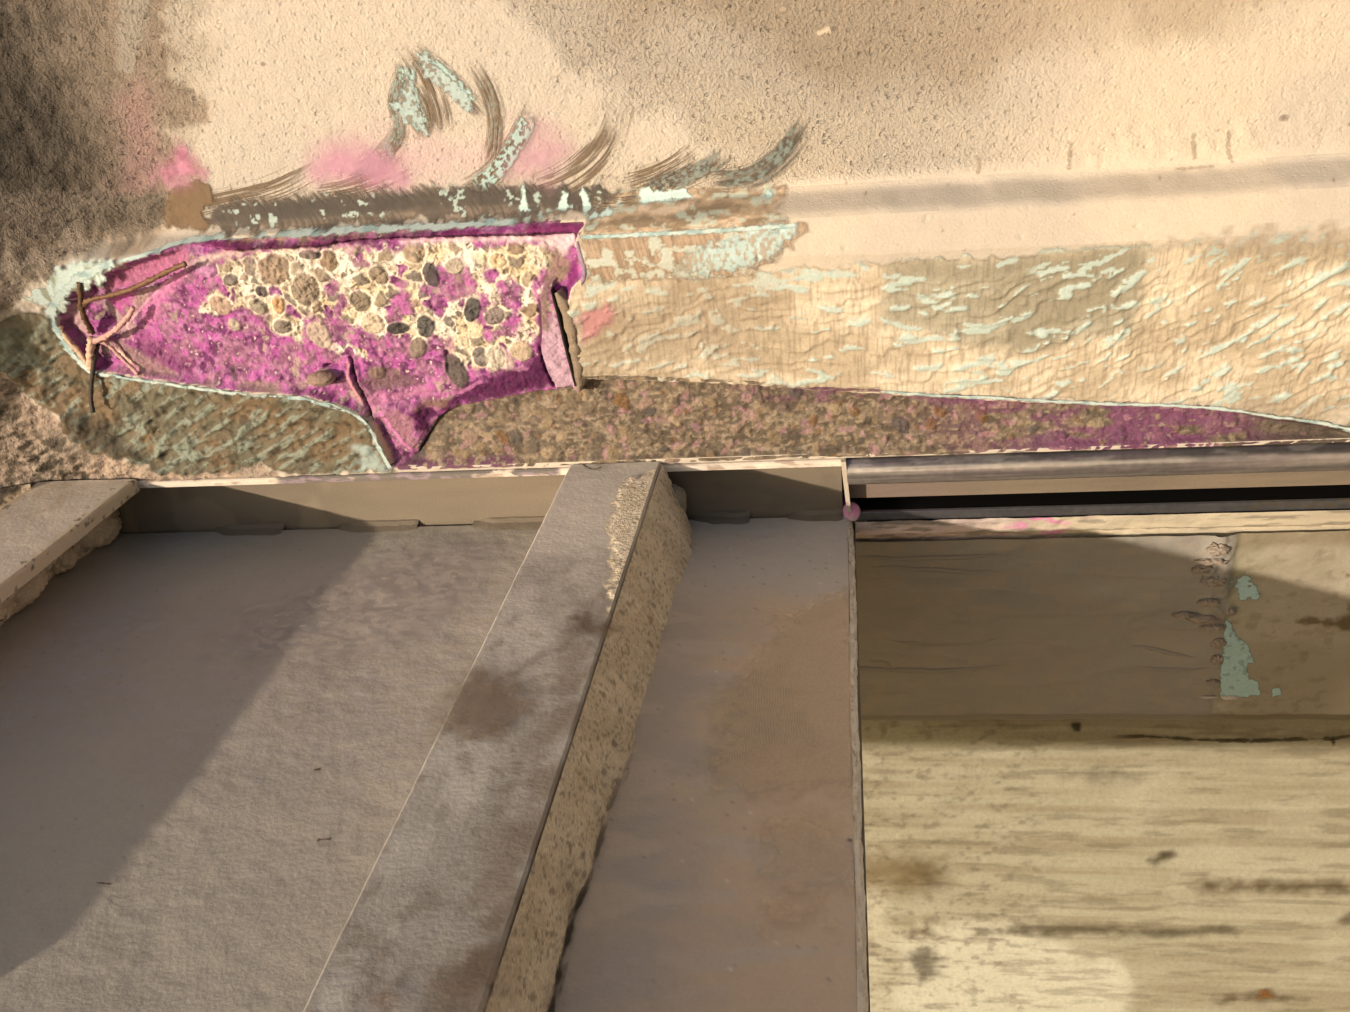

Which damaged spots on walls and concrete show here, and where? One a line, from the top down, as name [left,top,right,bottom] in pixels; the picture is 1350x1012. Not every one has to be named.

peeling [0,179,1350,476]
peeling [1172,542,1281,700]
crack [1125,735,1350,745]